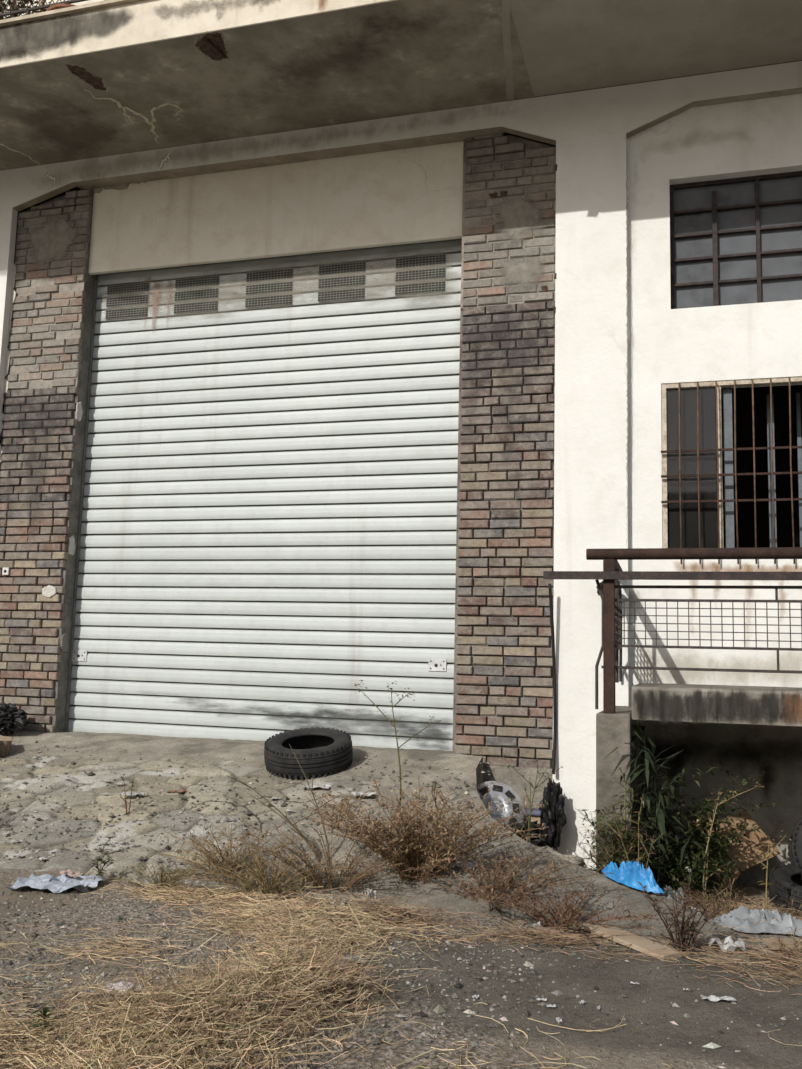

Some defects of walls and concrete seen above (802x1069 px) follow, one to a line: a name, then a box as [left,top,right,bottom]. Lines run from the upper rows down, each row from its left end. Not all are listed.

damp [157,0,272,17]
damp [0,11,131,61]
spalling [193,31,230,61]
spalling [65,64,108,91]
damp [634,690,796,723]
rust [785,697,802,722]
damp [640,741,702,793]